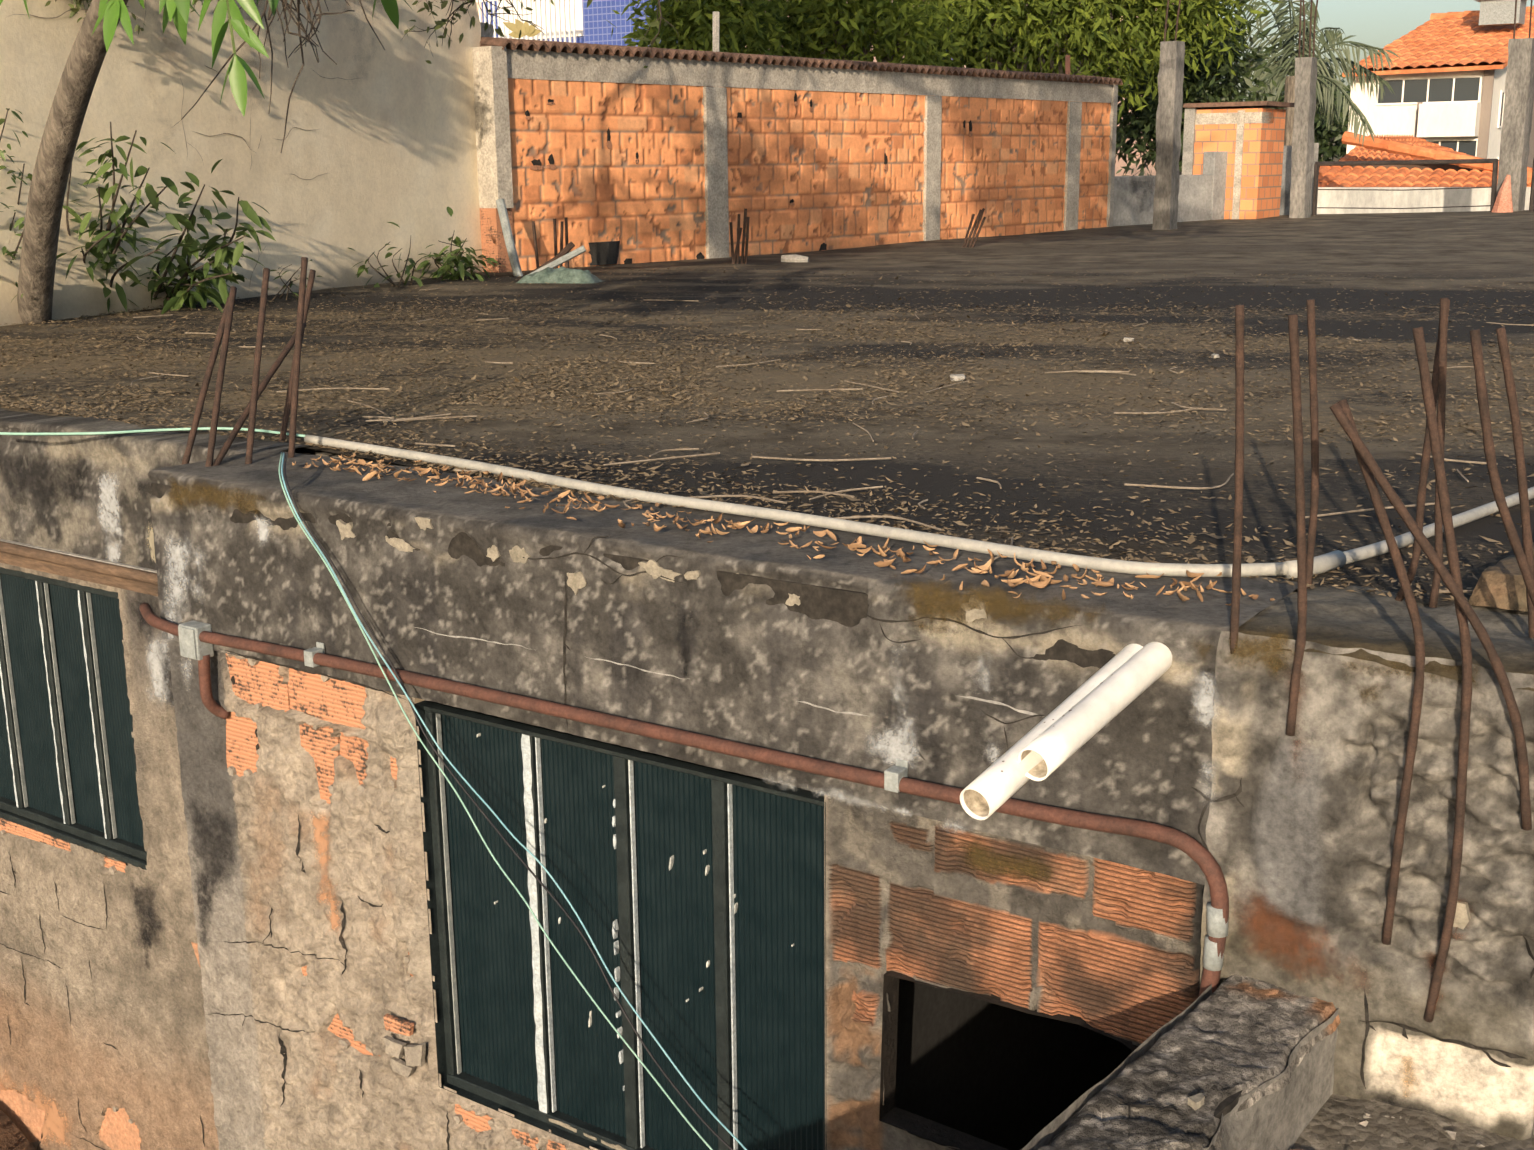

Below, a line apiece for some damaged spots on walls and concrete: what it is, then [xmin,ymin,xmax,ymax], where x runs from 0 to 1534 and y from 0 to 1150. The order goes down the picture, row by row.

efflorescence [98,475,121,562]
peeling [486,545,531,563]
peeling [567,572,587,595]
peeling [638,559,701,582]
crack [865,614,1081,659]
spalling [226,653,369,804]
damp [193,813,232,942]
crack [295,815,305,873]
damp [132,886,160,968]
crack [225,896,383,975]
crack [208,1013,315,1107]
spalling [99,1106,141,1150]